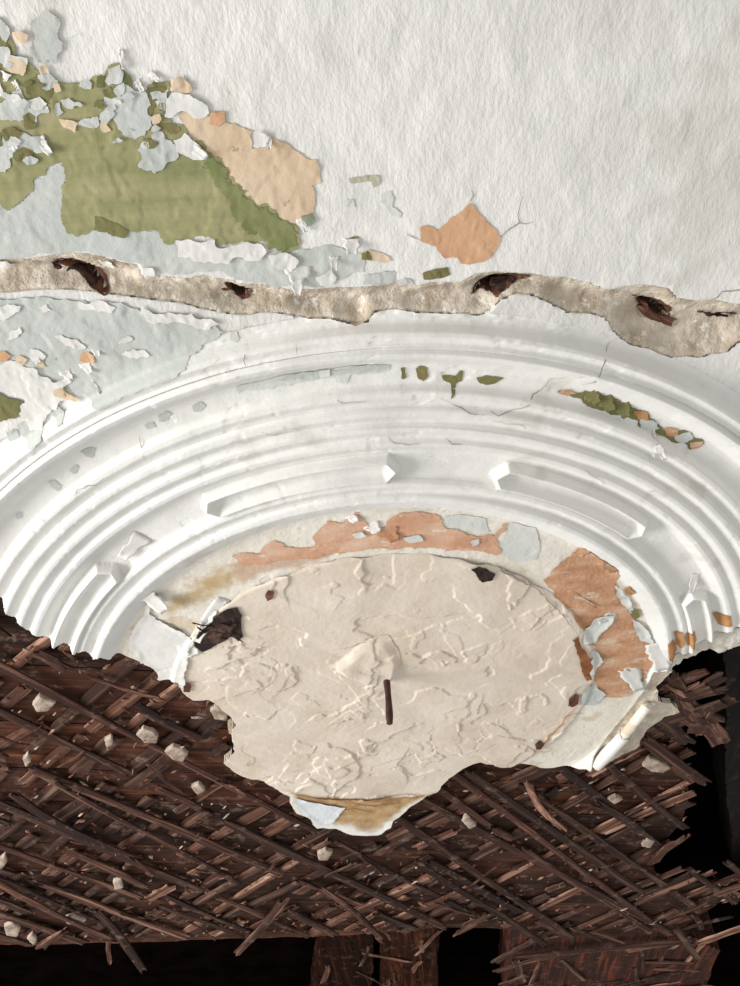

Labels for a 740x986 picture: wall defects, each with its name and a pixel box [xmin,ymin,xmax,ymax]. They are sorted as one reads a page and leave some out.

peeling [0,9,740,450]
peeling [558,389,704,461]
peeling [232,512,507,583]
peeling [128,592,243,688]
peeling [544,547,740,768]
peeling [292,798,345,826]
damp [284,790,424,830]